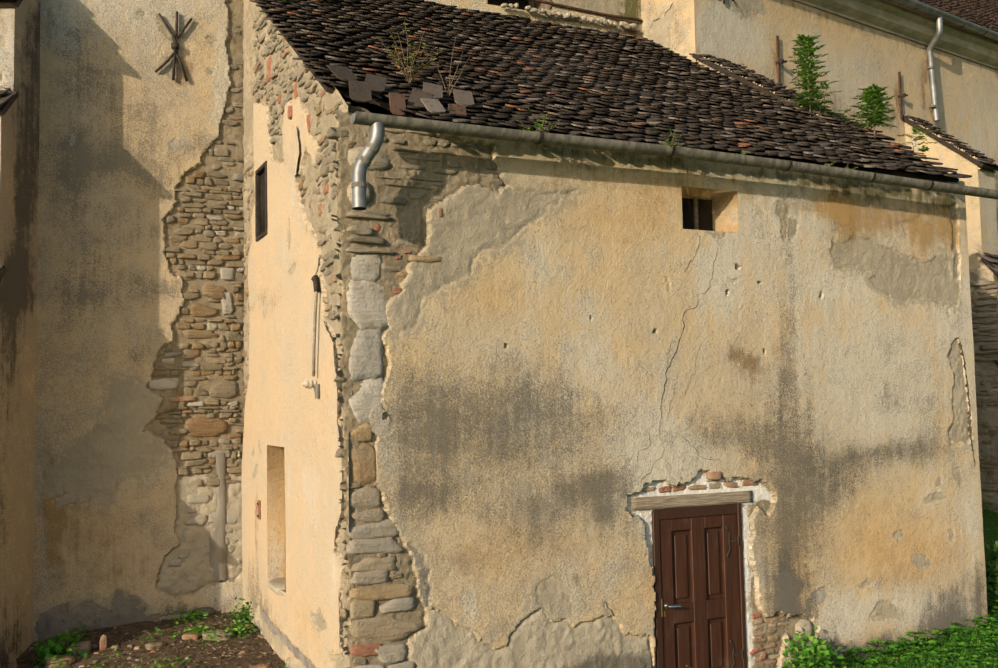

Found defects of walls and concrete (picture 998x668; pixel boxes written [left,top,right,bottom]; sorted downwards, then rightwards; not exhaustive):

spalling [242,0,654,668]
damp [380,366,634,546]
crack [637,235,723,480]
damp [690,279,950,630]
spalling [830,204,998,513]
damp [798,630,900,668]
damp [918,569,987,638]